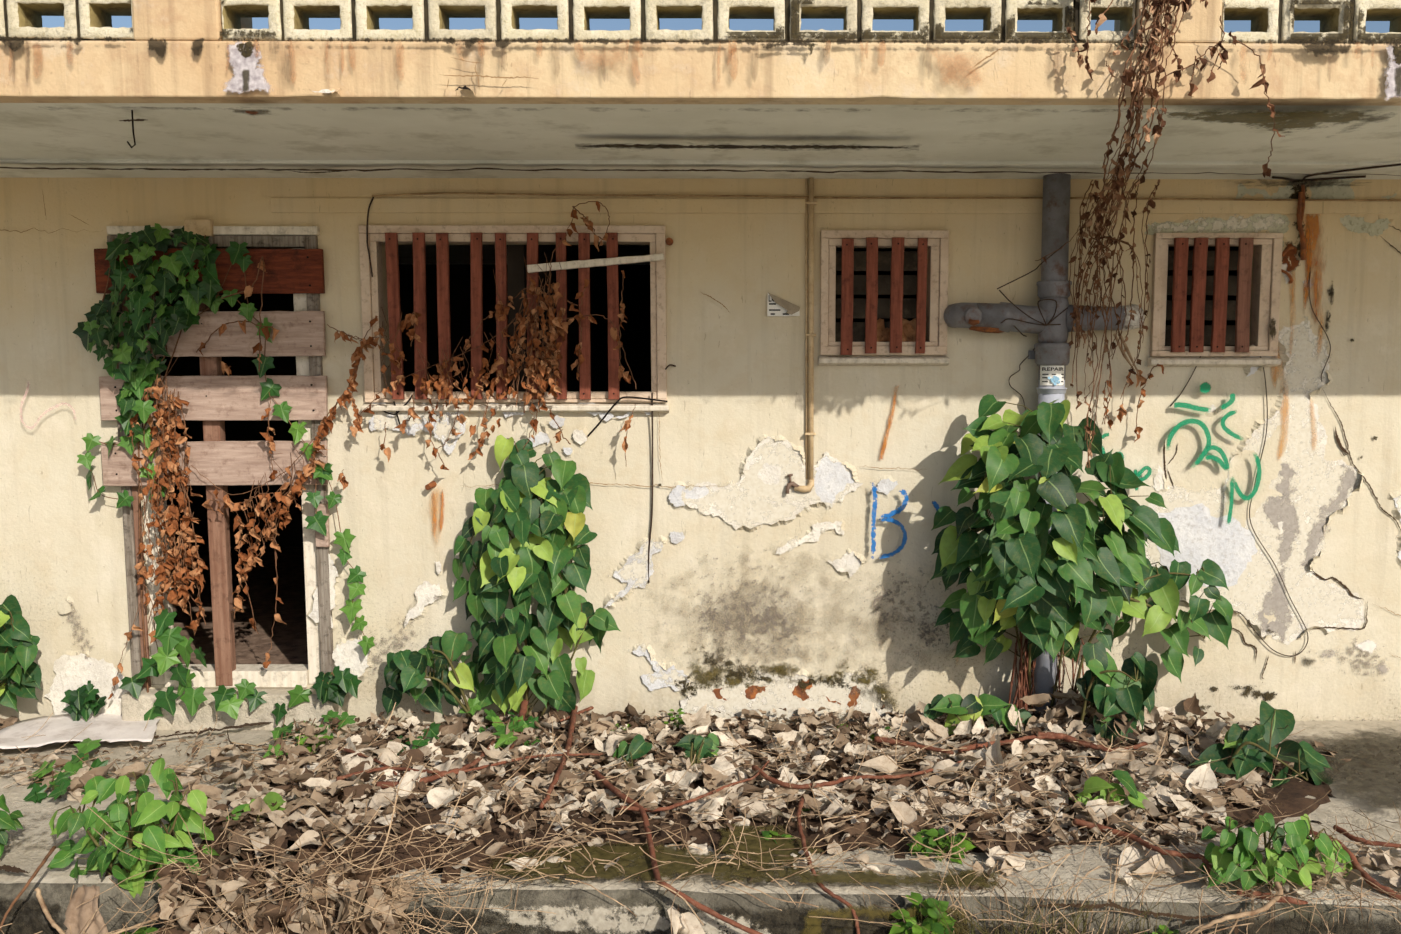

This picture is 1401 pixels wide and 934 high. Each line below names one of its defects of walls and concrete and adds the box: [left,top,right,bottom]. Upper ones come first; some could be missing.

rust [1282,214,1323,345]
rust [433,491,444,531]
peeling [369,402,526,455]
peeling [528,402,664,459]
peeling [658,434,898,578]
rust [880,396,896,459]
peeling [1144,316,1365,645]
rust [1279,397,1288,457]
crack [1323,390,1401,530]
peeling [603,531,685,610]
mould [674,554,897,709]
mould [846,571,948,653]